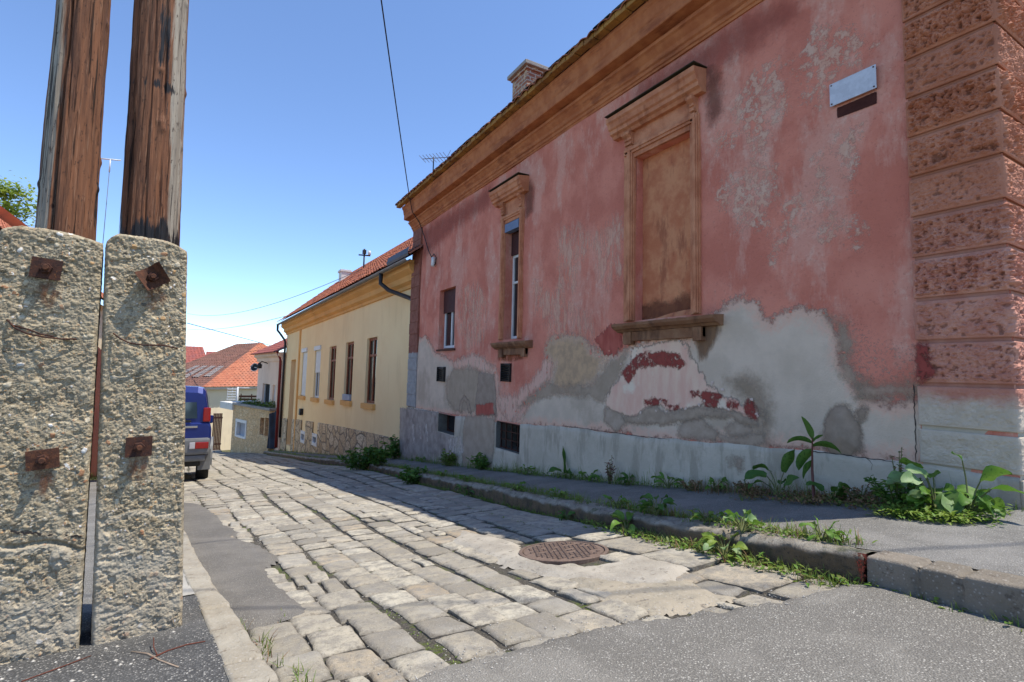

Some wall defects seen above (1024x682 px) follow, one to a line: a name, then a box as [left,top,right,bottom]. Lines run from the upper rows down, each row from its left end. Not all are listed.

peeling [416,293,935,464]